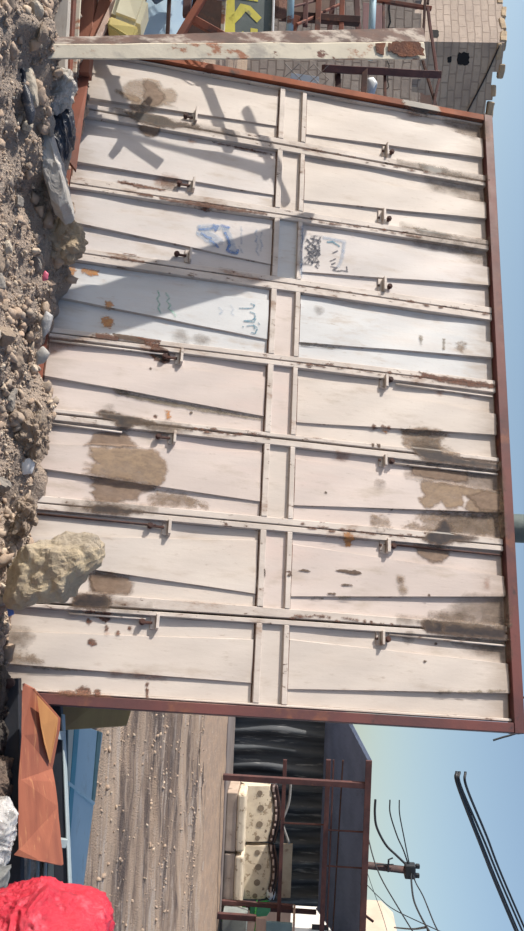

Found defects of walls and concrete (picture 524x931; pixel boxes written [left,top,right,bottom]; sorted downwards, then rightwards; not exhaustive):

rust [53,28,425,57]
damp [116,79,176,137]
rust [118,181,267,215]
rust [150,346,170,363]
damp [86,432,207,507]
damp [401,427,504,562]
damp [89,571,132,595]
damp [441,621,509,640]